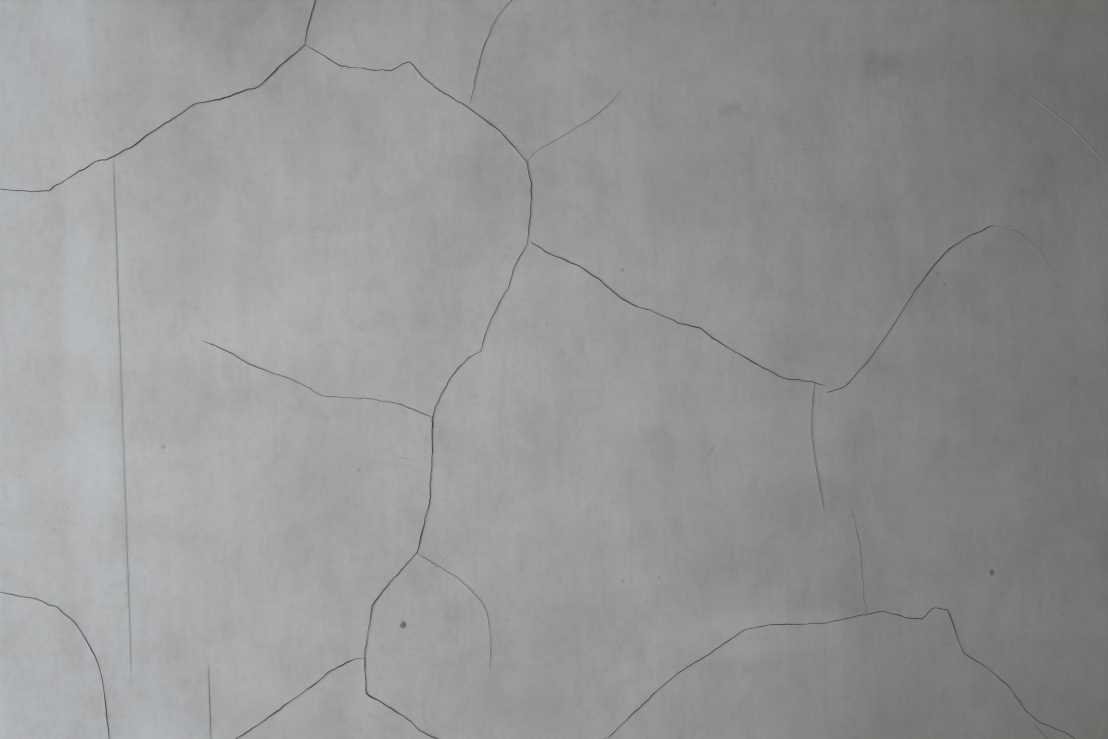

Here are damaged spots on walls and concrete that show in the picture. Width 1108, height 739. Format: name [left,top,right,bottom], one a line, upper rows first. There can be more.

crack [1,0,1053,509]
crack [0,592,109,736]
crack [236,442,491,739]
crack [604,511,1075,739]